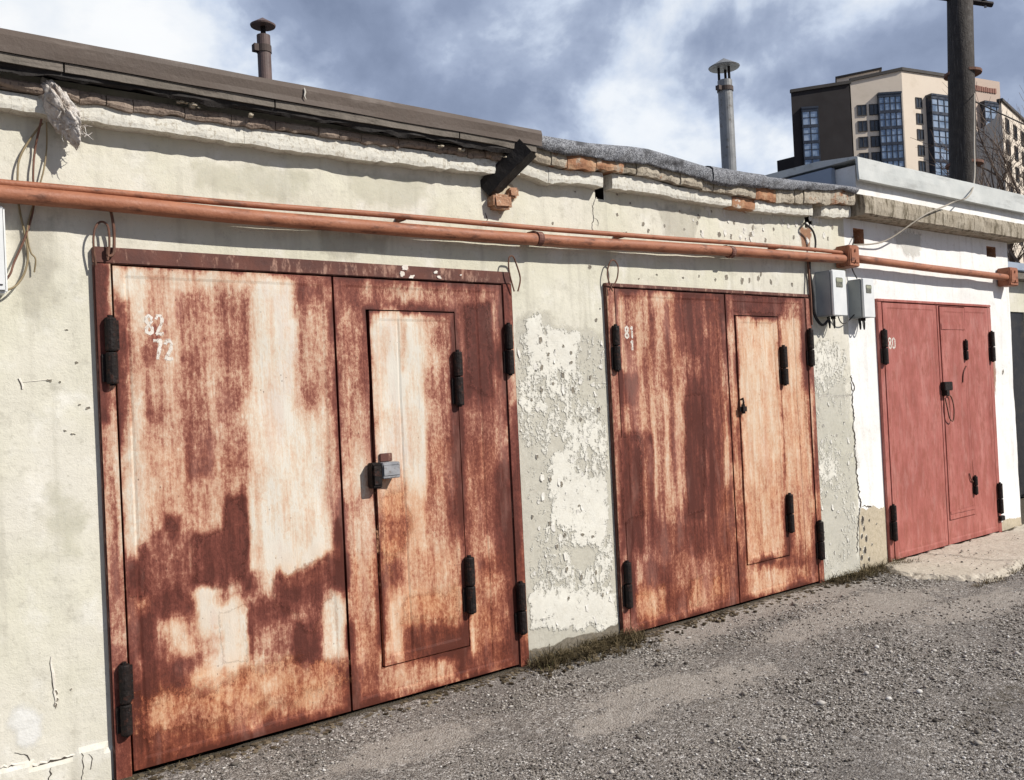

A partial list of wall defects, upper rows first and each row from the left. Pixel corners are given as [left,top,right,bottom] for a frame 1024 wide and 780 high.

spalling [485,184,519,221]
peeling [516,308,644,662]
peeling [813,338,888,574]
rust [375,481,414,589]
rust [400,582,462,629]
rust [635,583,666,626]
rust [689,573,723,607]
rust [132,652,347,743]